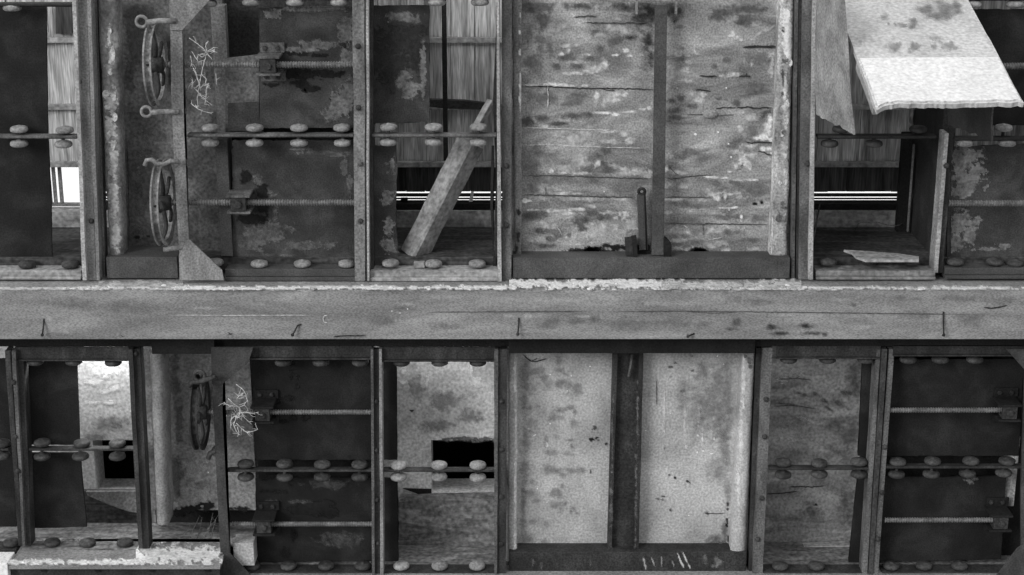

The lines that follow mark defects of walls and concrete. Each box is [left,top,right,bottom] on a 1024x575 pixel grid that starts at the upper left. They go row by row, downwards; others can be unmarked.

peeling [385,11,421,24]
peeling [263,6,354,123]
peeling [395,39,427,101]
crack [526,84,653,92]
damp [522,2,775,251]
crack [522,167,711,198]
peeling [951,146,1012,253]
damp [521,361,580,453]
damp [546,469,583,512]